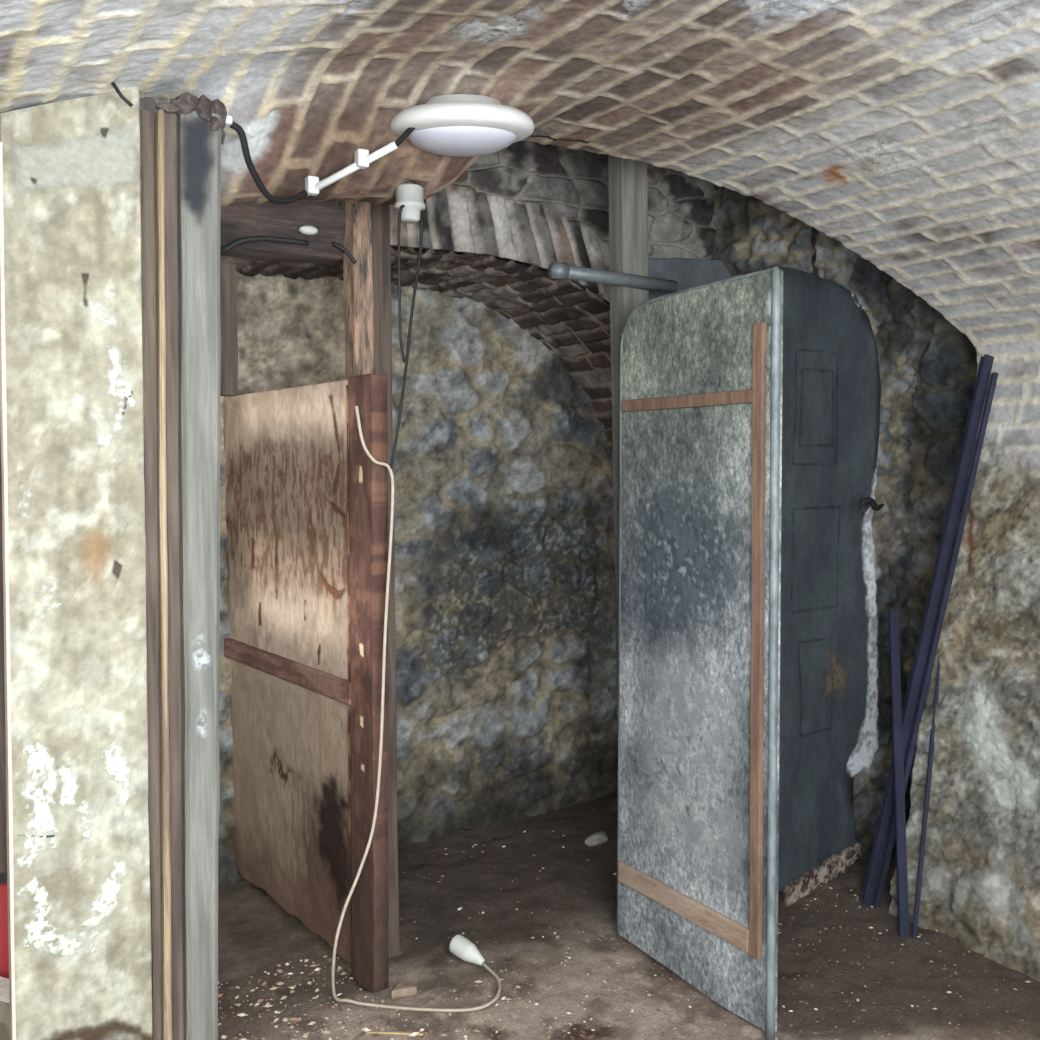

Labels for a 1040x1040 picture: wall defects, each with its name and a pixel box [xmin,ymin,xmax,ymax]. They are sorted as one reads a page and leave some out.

leakage [183,119,212,214]
peeling [16,742,130,956]
leakage [315,778,348,904]
leakage [52,1021,152,1040]